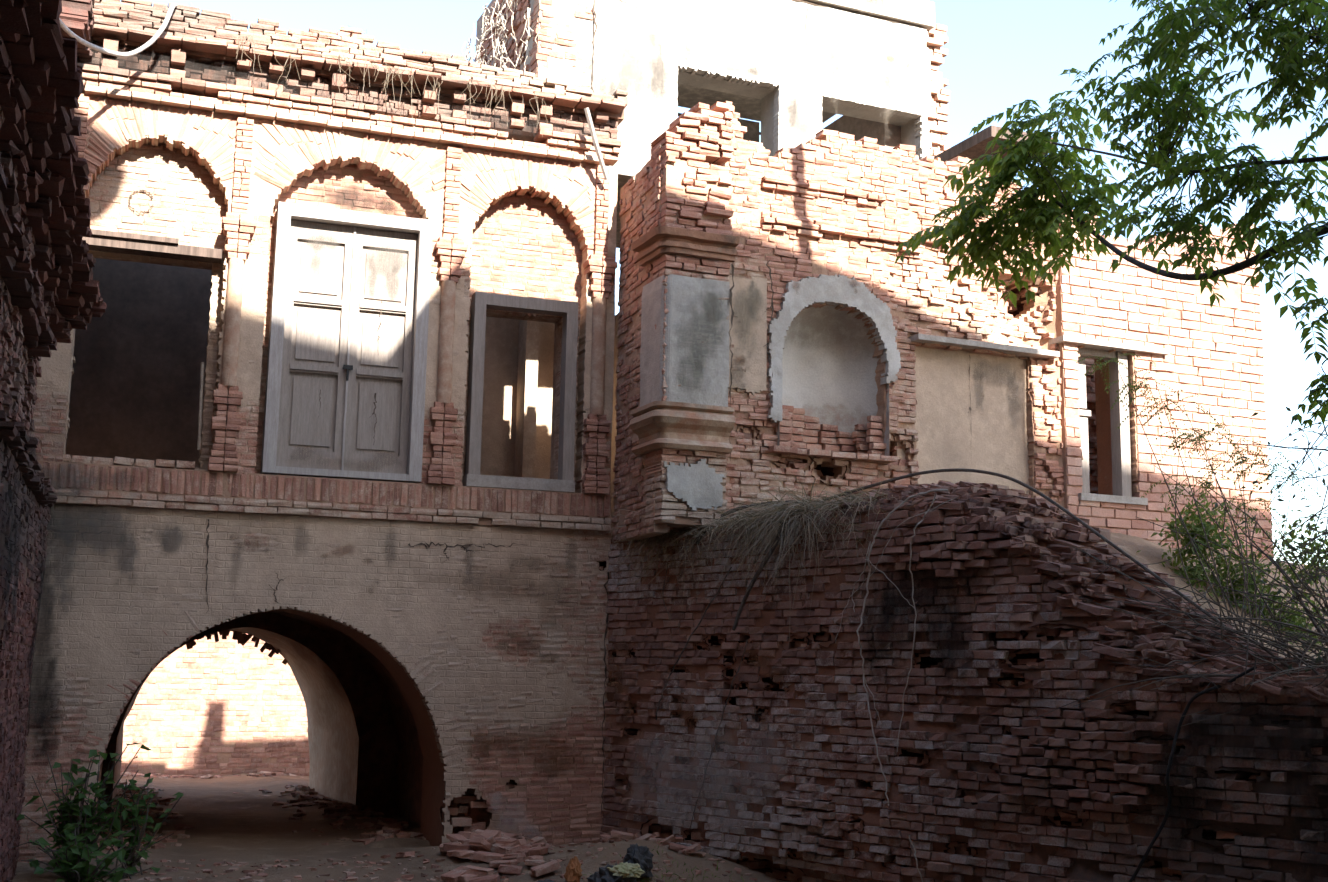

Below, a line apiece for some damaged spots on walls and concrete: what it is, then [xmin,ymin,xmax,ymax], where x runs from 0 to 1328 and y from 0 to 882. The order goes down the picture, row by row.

spalling [997,278,1046,326]
spalling [882,433,915,472]
spalling [774,454,847,486]
crack [408,542,523,564]
spalling [781,625,839,651]
spalling [912,653,942,669]
spalling [695,632,789,722]
spalling [893,747,930,767]
spalling [640,819,710,847]